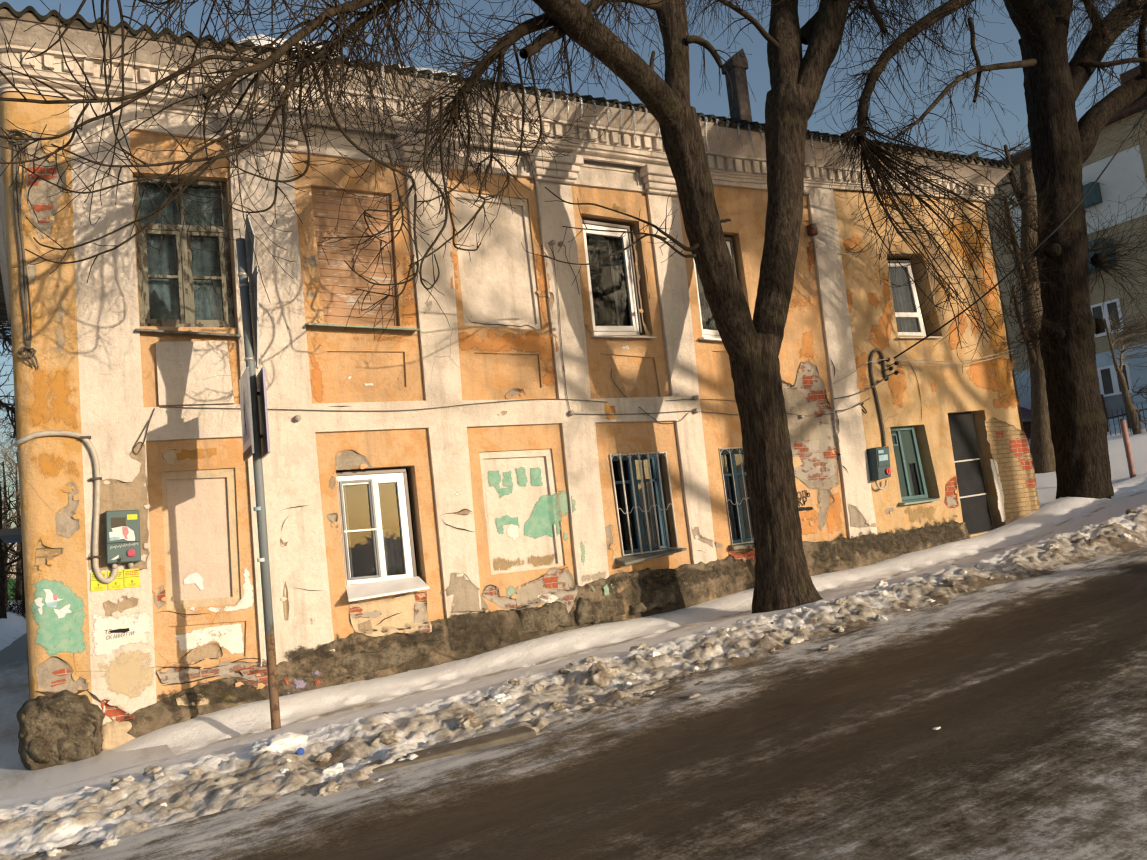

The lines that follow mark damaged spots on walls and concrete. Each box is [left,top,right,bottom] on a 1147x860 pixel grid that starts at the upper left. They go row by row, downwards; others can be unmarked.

flaking render [23,129,66,239]
peeling [34,481,83,572]
peeling [329,450,373,489]
flaking render [782,361,841,530]
peeling [849,504,876,528]
flaking render [944,476,959,508]
flaking render [984,417,1040,525]
flaking render [349,567,578,637]
flaking render [35,656,90,692]
flaking render [156,642,268,706]
flaking render [99,697,135,722]